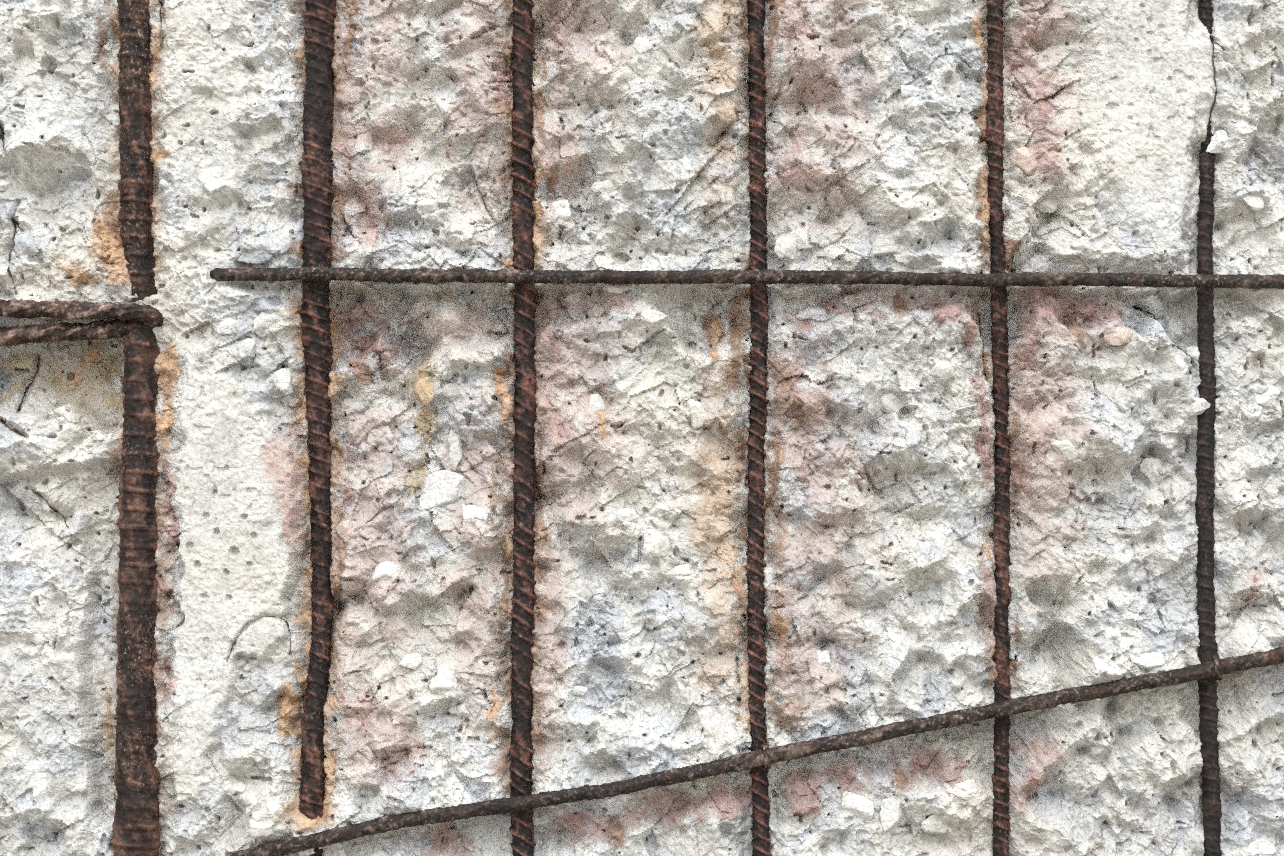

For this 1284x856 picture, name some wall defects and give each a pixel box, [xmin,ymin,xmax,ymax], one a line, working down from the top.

corrosion [63,190,129,286]
corrosion [330,0,384,263]
spalling [334,280,508,296]
spalling [300,0,1284,275]
crack [1208,33,1224,128]
corrosion [154,344,181,625]
corrosion [262,290,424,831]
corrosion [487,331,516,791]
corrosion [530,291,633,774]
corrosion [692,353,830,745]
spalling [322,283,1284,856]
spalling [310,838,357,856]